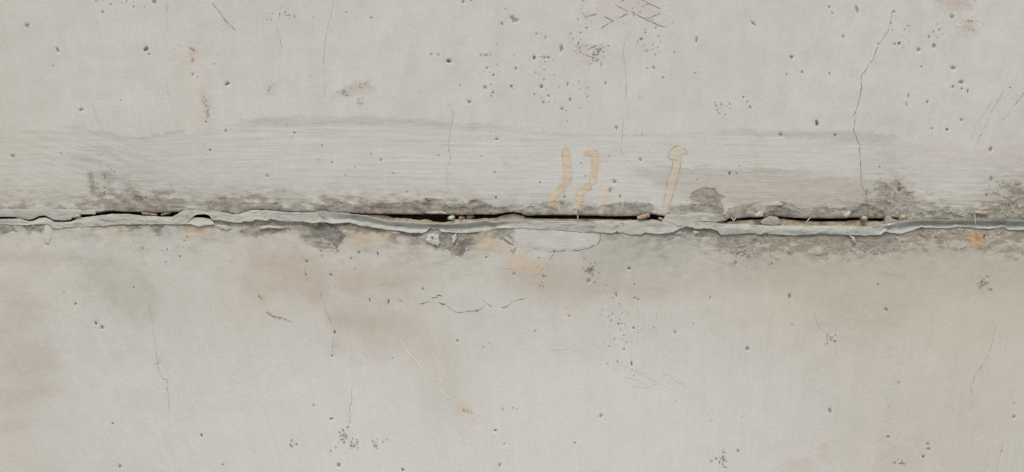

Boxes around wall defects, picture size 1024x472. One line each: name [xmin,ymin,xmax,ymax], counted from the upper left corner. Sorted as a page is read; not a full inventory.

crack [718,17,895,223]
rust [546,146,616,216]
damp [626,162,870,211]
spalling [0,222,45,236]
crack [0,211,215,222]
spalling [126,224,164,235]
crack [350,213,686,269]
spalling [203,166,1024,276]